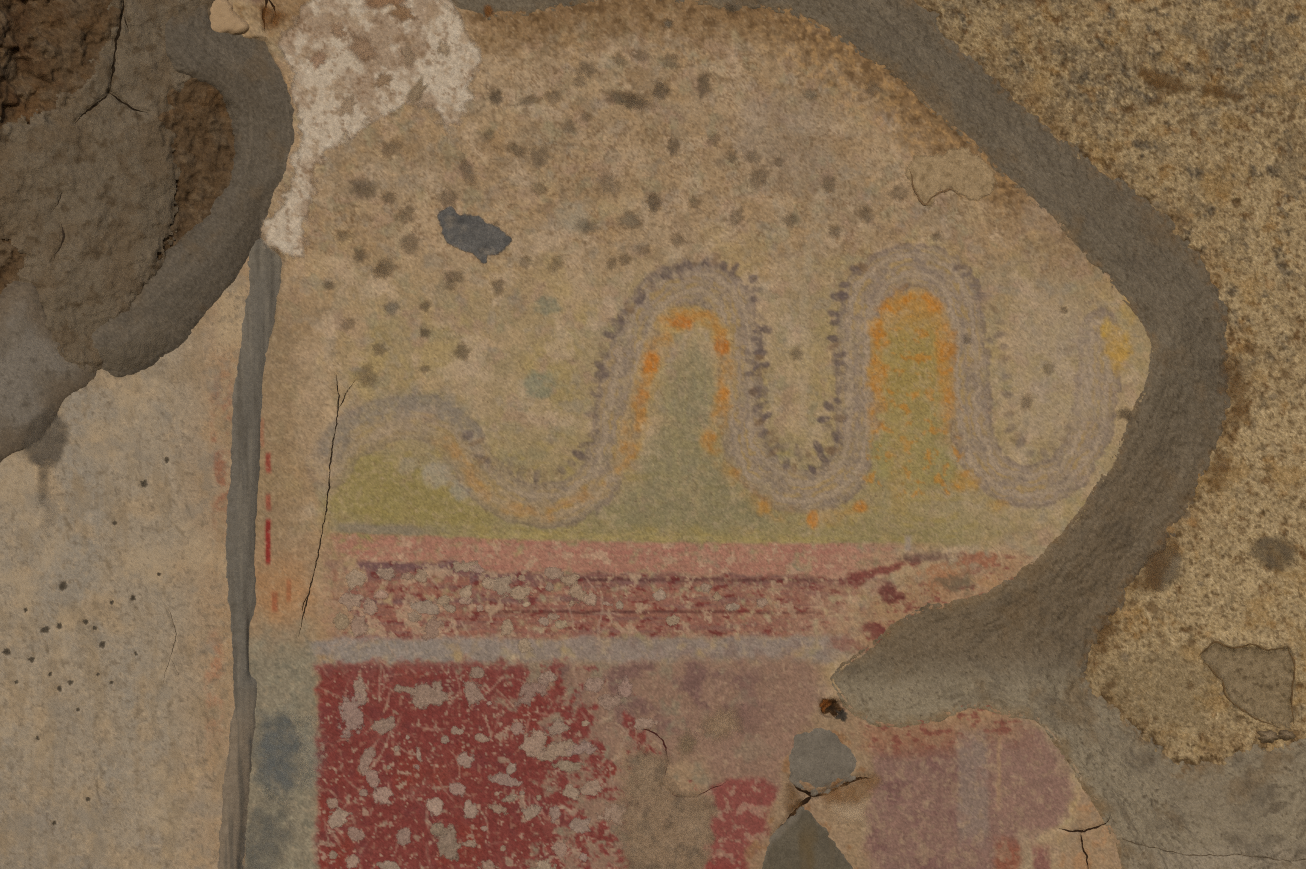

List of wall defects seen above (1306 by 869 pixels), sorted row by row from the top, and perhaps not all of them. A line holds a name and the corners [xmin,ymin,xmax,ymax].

flaking render [210,0,249,35]
crack [75,0,147,123]
crack [299,375,354,633]
peeling [408,560,624,640]
peeling [327,798,365,869]
peeling [358,747,394,804]
peeling [338,678,421,769]
peeling [394,681,448,709]
peeling [426,718,627,869]
crack [643,729,723,797]
crack [782,777,873,825]
flaking render [1199,641,1296,728]